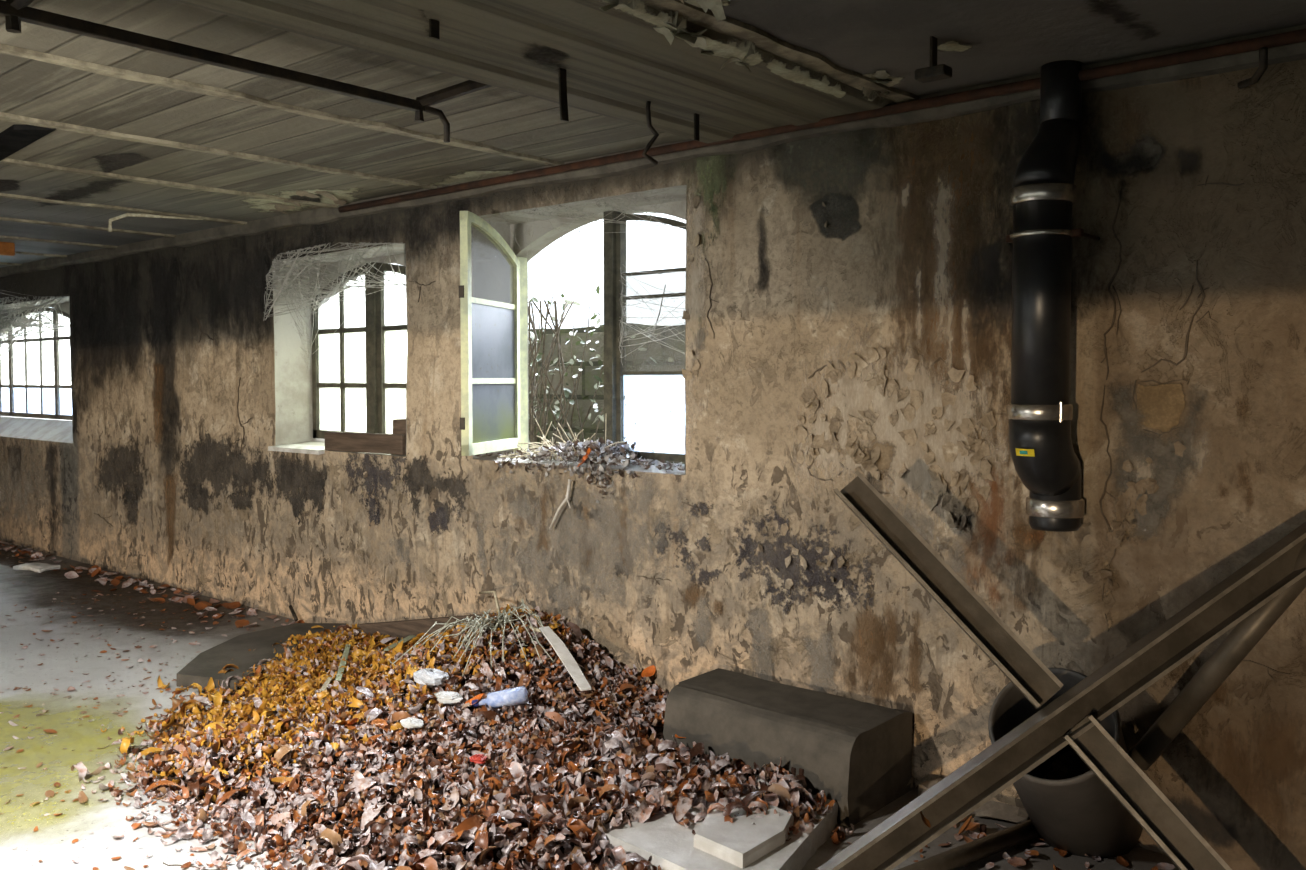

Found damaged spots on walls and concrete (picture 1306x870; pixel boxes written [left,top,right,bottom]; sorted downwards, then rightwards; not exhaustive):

peeling [599,0,846,98]
peeling [937,40,971,52]
damp [758,209,769,290]
flaking render [810,193,861,240]
damp [775,102,1040,463]
crack [1141,260,1218,373]
damp [95,431,149,526]
damp [153,364,164,444]
flaking render [794,344,1006,533]
crack [1099,185,1122,632]
damp [165,427,722,646]
peeling [735,502,874,614]